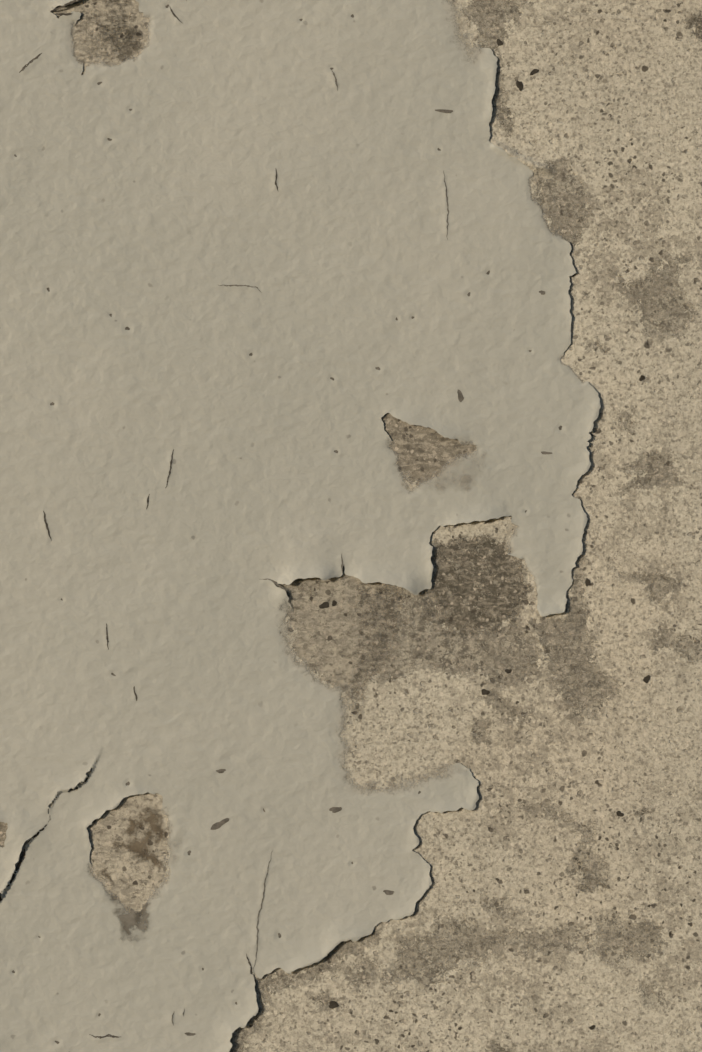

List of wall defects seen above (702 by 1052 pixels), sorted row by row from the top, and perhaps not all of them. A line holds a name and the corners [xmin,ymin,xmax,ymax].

peeling [51,0,150,72]
spalling [464,0,525,137]
spalling [533,156,593,338]
spalling [607,256,698,338]
peeling [381,400,478,486]
peeling [573,392,601,489]
peeling [443,498,511,526]
peeling [275,506,619,726]
crack [0,755,100,903]
peeling [78,781,170,914]
peeling [392,867,432,920]
peeling [213,911,665,1052]